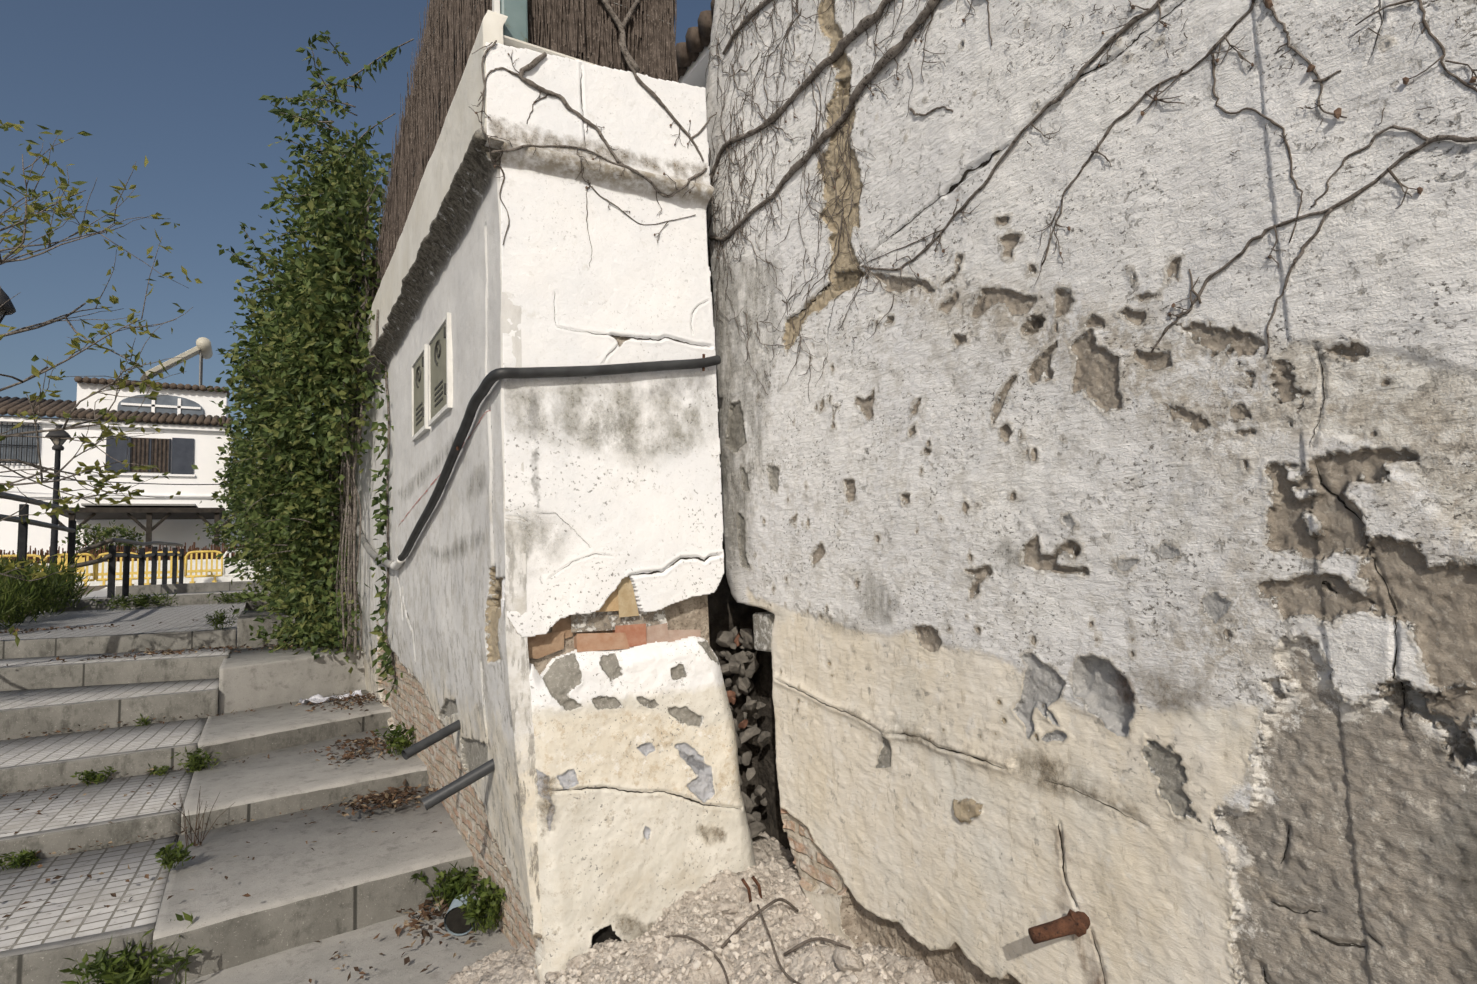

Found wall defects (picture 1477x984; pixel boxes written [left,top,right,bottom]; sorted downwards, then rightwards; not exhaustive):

crack [554,209,717,378]
peeling [782,0,1181,461]
water stain [560,386,595,446]
crack [1310,350,1405,731]
flaking render [376,619,544,969]
flaking render [485,566,719,804]
crack [552,541,1001,851]
spalling [780,808,1021,984]
spalling [980,621,1135,742]
corrosion [1067,909,1087,937]
crack [1045,780,1141,822]
peeling [1142,431,1477,984]